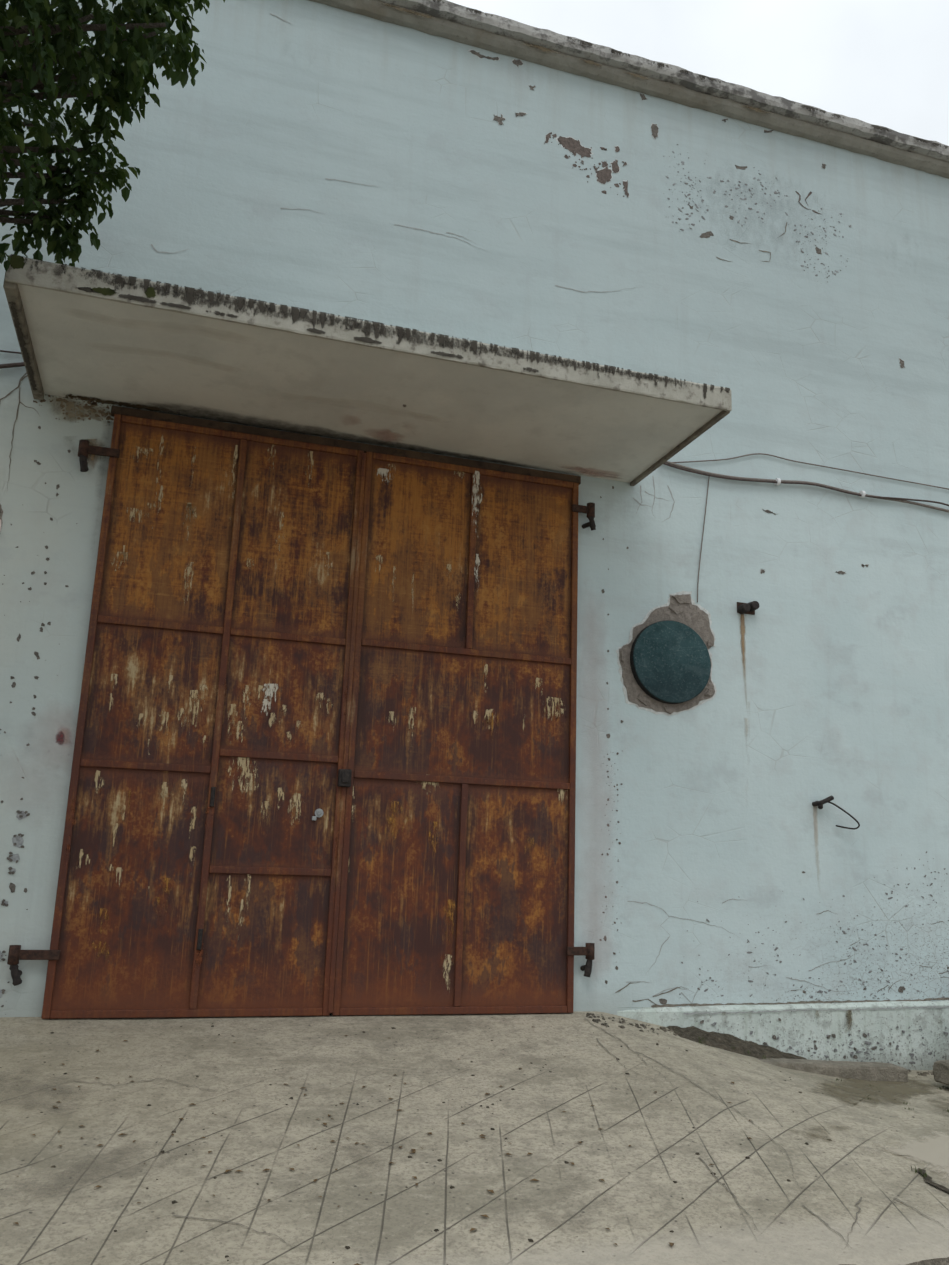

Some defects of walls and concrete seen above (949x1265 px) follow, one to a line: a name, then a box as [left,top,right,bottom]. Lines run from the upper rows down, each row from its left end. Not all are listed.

spalling [467,49,523,67]
peeling [493,112,527,125]
peeling [543,132,630,198]
crack [0,372,32,489]
peeling [1,798,30,907]
crack [615,899,949,1015]
crack [585,1018,862,1245]